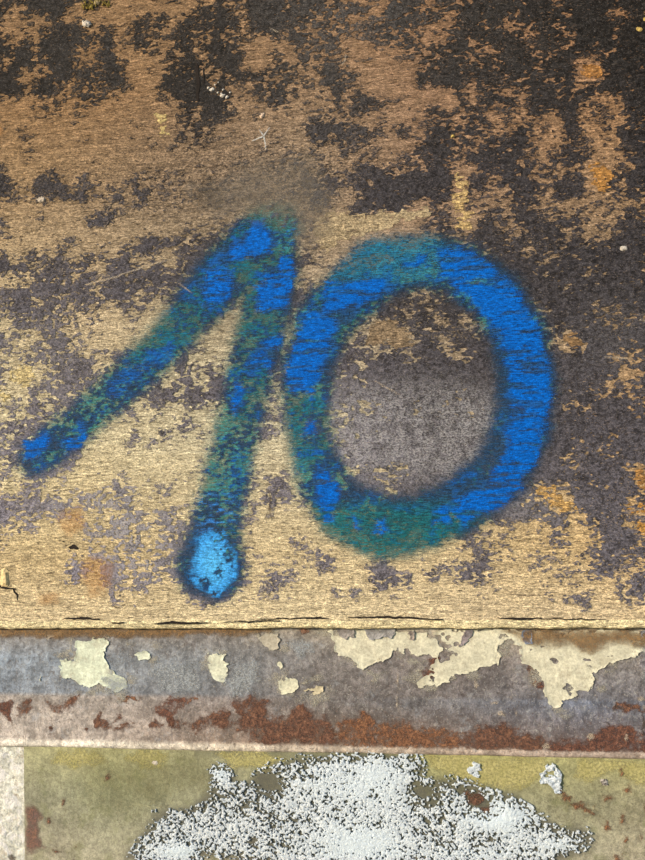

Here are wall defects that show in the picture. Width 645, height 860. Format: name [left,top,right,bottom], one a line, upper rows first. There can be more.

peeling [57,634,134,702]
peeling [135,644,159,663]
peeling [201,651,229,683]
peeling [250,629,328,707]
peeling [315,628,645,718]
rust [0,699,32,723]
rust [47,695,79,713]
rust [84,712,134,731]
rust [149,695,645,753]
efflorescence [127,746,594,860]
rust [559,790,594,815]